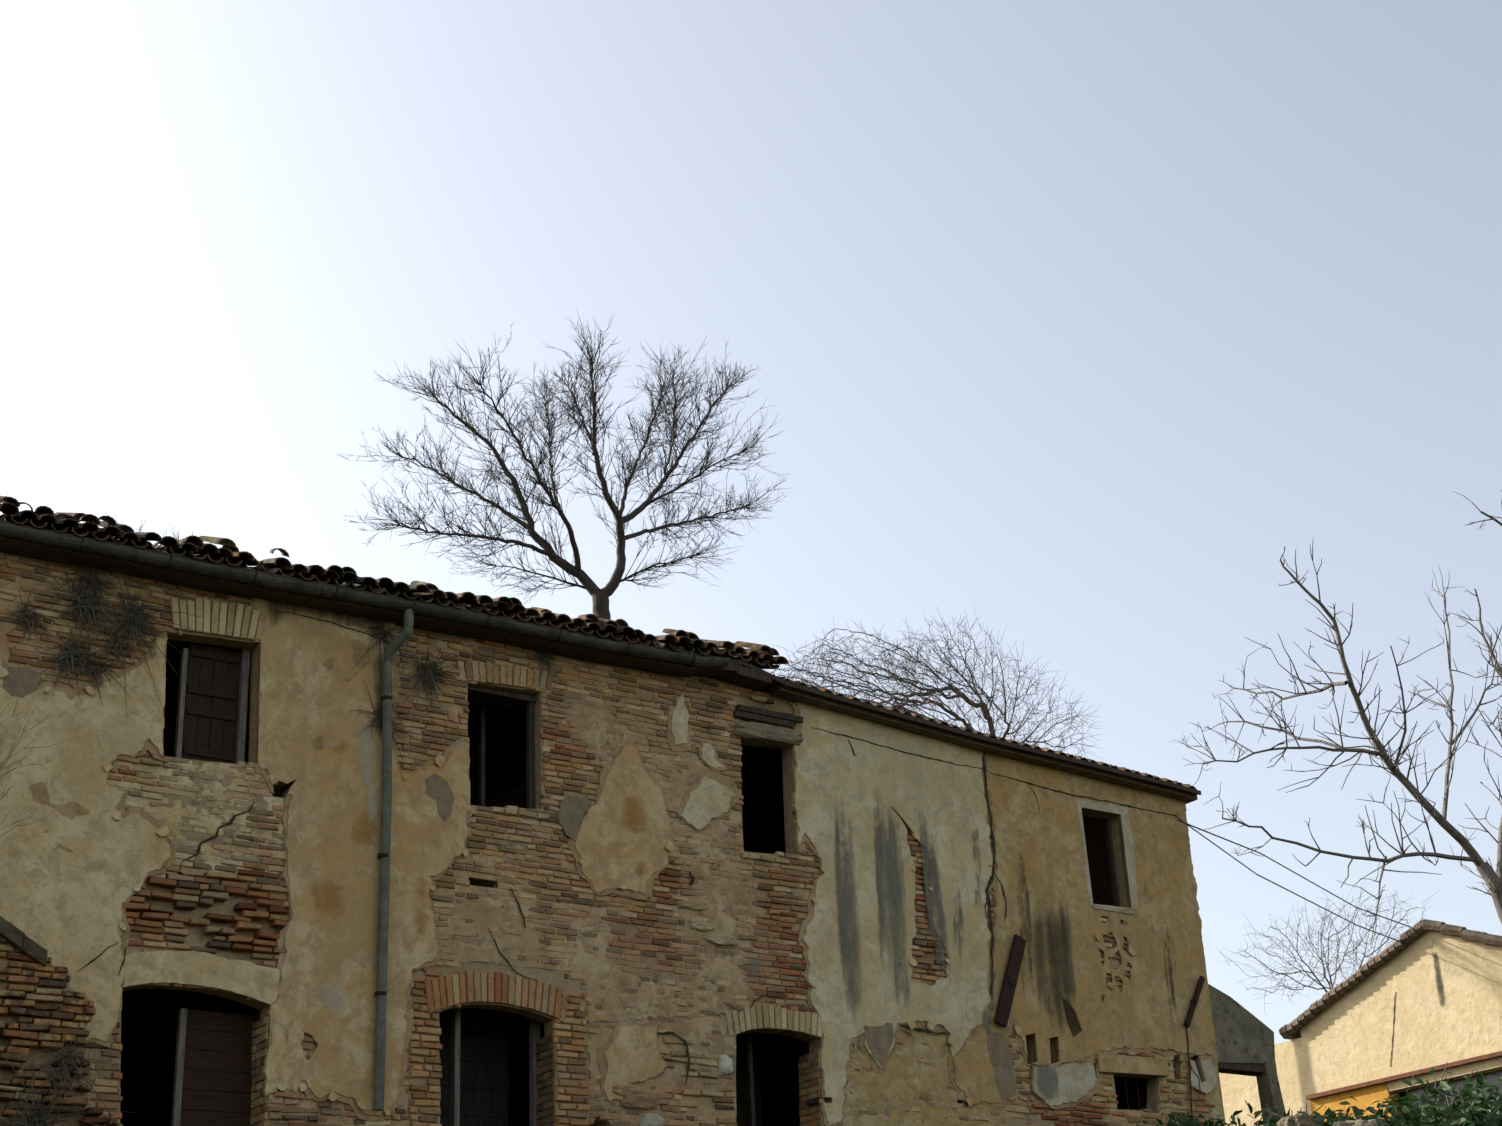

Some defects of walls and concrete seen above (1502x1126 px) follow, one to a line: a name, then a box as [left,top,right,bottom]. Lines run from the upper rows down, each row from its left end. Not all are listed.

spalling [0,553,249,698]
spalling [139,983,220,991]
spalling [103,750,289,968]
spalling [392,626,826,1126]
leakage [836,823,859,1004]
leakage [875,823,909,994]
spalling [906,827,951,984]
leakage [921,828,981,967]
crack [812,727,1178,1000]
leakage [1021,878,1072,1005]
flaking render [83,1022,123,1119]
spalling [806,1019,1225,1126]